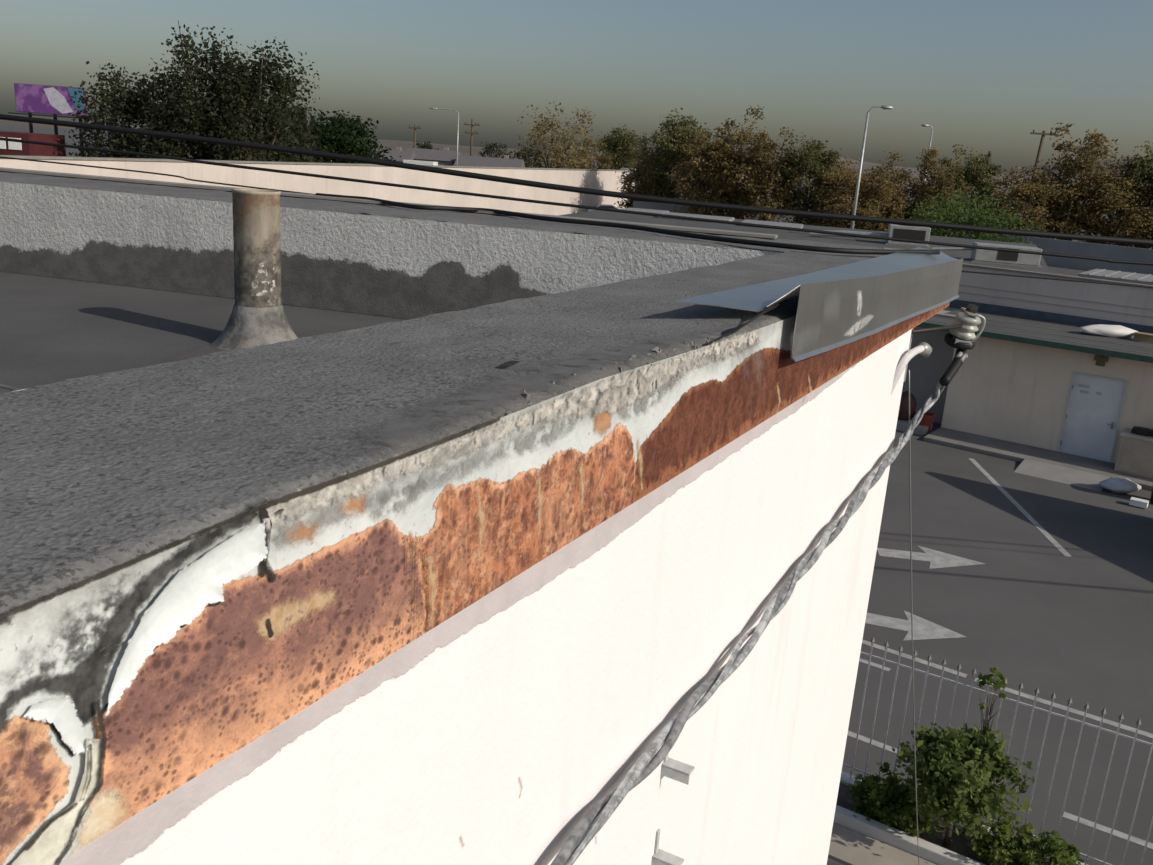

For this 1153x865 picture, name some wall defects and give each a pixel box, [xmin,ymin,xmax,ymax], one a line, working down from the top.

damp [0,240,235,298]
damp [281,251,547,319]
flaking render [11,331,867,865]
rust [89,302,950,836]
rust [0,716,71,865]